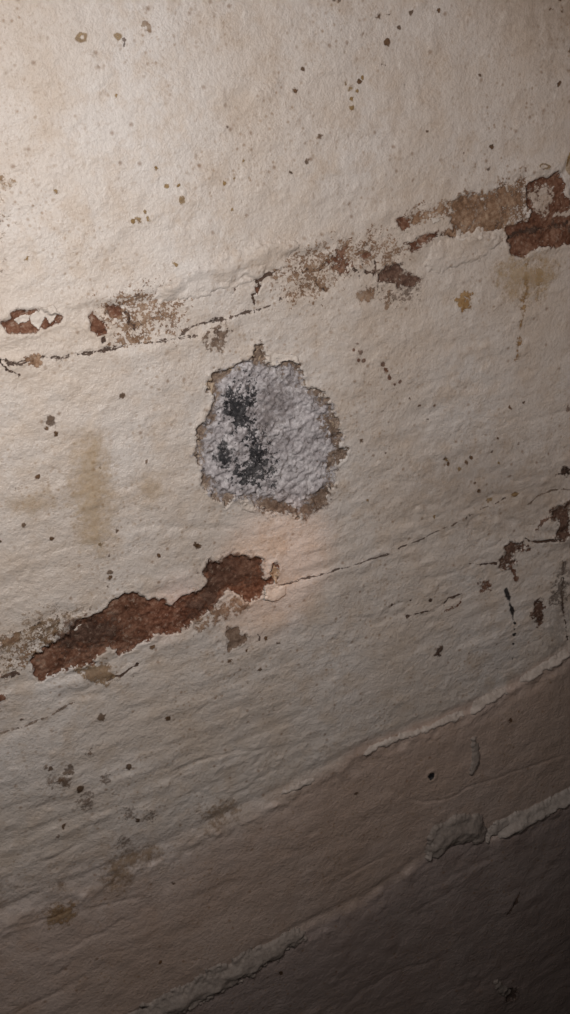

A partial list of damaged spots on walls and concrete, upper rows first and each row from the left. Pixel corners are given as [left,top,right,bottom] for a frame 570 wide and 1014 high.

flaking render [251,168,570,313]
peeling [1,305,63,334]
peeling [88,276,193,348]
crack [0,297,282,377]
crack [280,488,570,586]
flaking render [0,552,286,687]